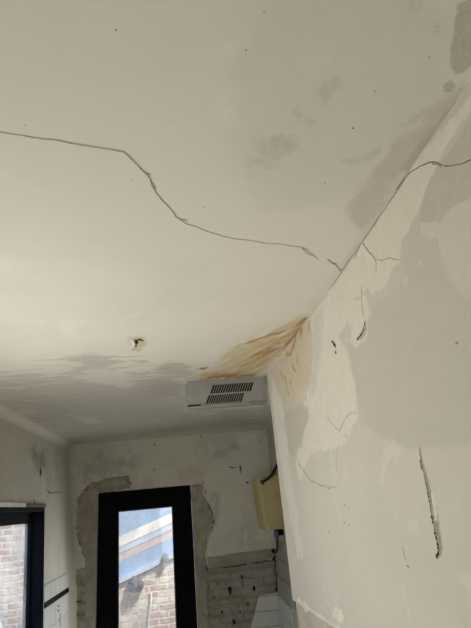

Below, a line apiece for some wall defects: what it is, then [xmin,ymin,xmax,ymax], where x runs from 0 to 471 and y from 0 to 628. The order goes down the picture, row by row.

crack [0,131,471,290]
peeling [282,94,471,457]
flaking render [125,336,148,351]
rust [193,313,310,381]
flaking render [75,476,132,628]
spalling [419,447,443,559]
flaking render [293,597,345,628]